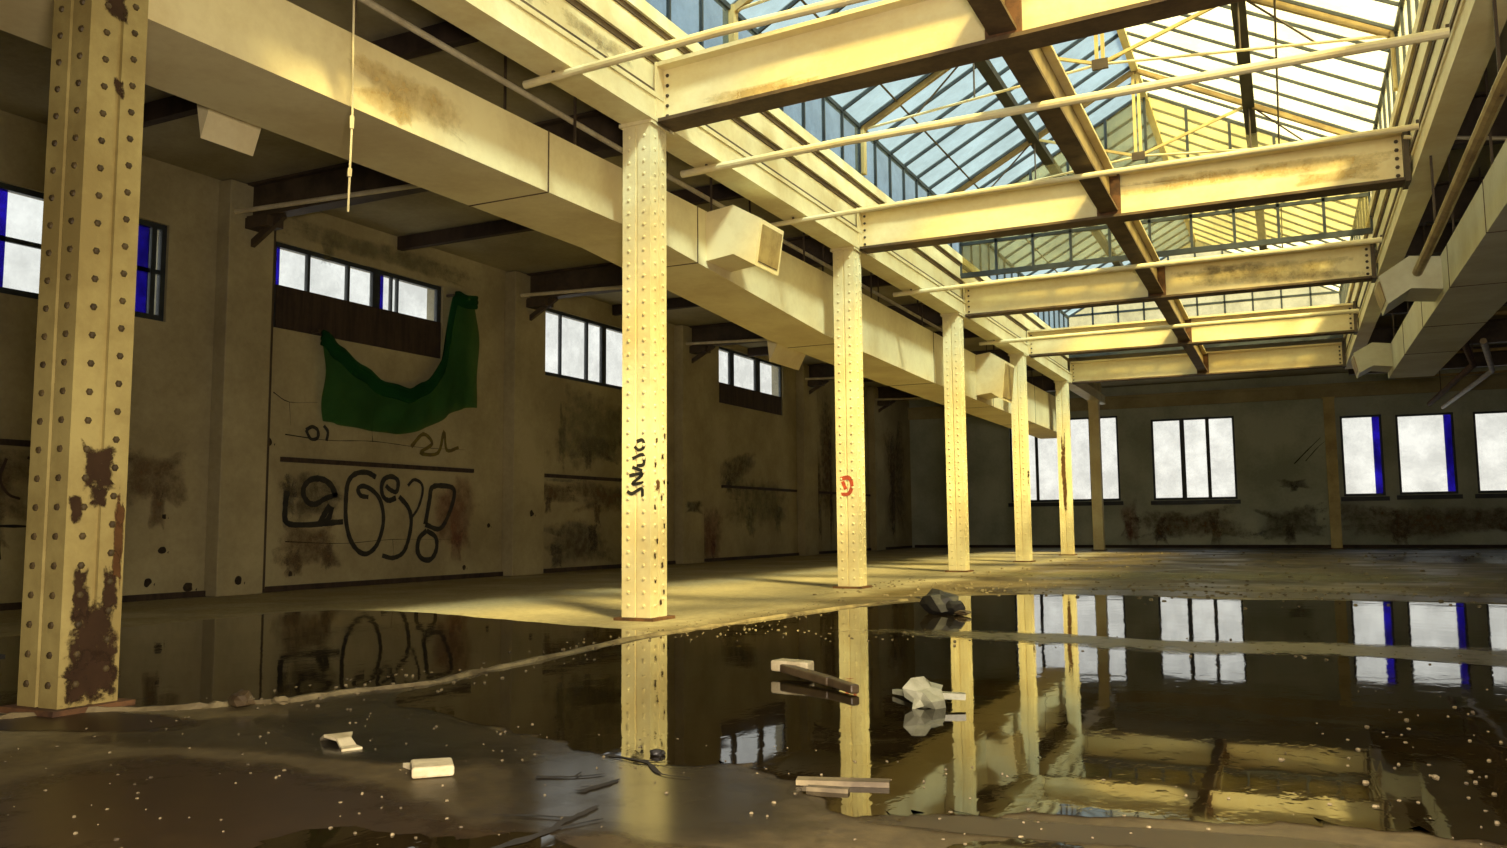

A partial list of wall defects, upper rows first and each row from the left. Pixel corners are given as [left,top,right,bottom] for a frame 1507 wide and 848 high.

rust [62,494,125,703]